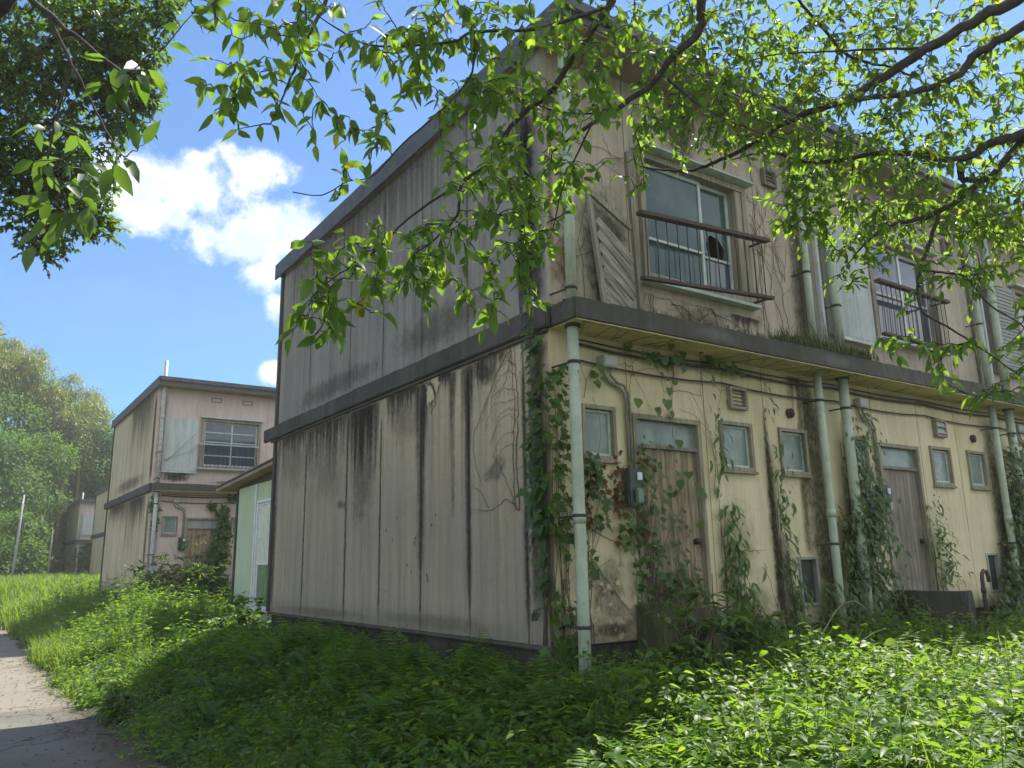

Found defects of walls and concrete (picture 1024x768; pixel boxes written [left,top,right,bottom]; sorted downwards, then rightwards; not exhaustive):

water stain [280,384,427,604]
water stain [440,351,503,603]
water stain [764,429,791,610]
water stain [788,376,835,592]